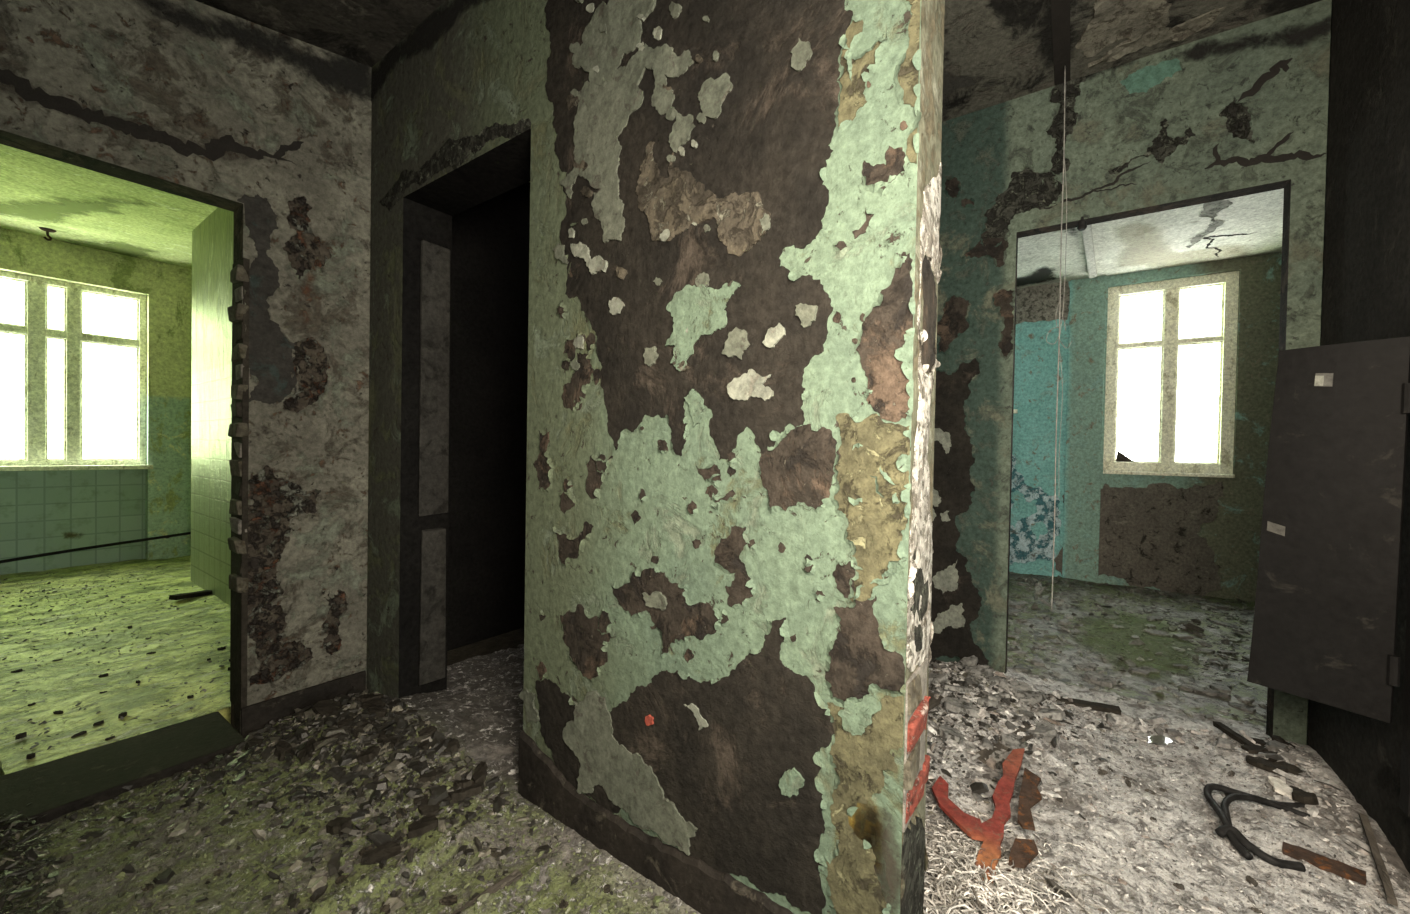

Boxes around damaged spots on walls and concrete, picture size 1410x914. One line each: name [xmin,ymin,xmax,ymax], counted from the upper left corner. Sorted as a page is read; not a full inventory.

crack [0,69,303,166]
crack [1237,58,1293,102]
crack [1204,132,1327,169]
peeling [227,193,350,711]
peeling [518,0,1233,914]